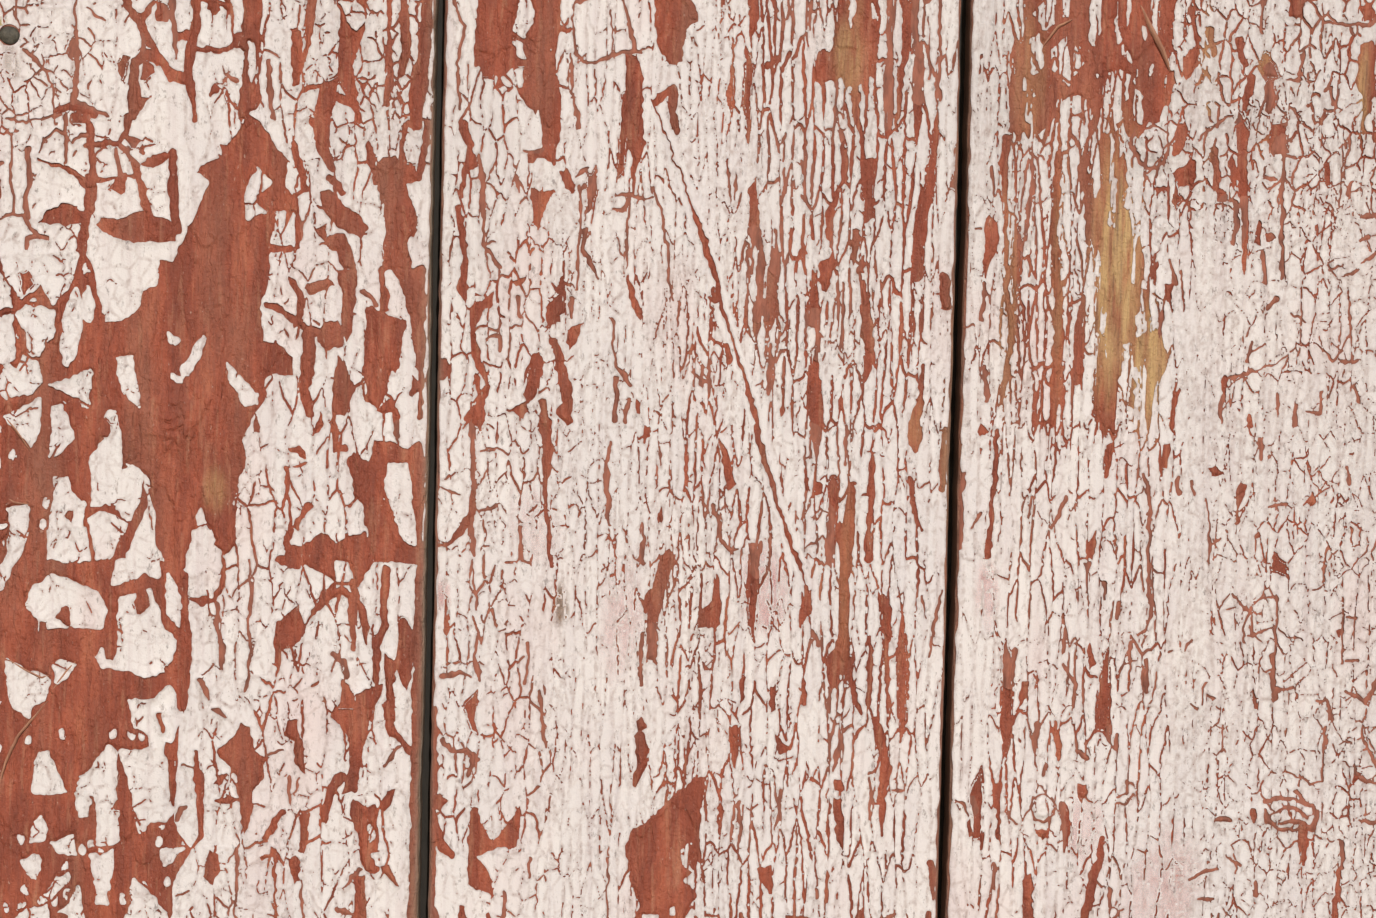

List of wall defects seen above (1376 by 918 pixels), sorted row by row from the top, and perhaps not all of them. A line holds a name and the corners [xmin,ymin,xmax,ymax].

peeling [0,0,584,918]
crack [446,0,544,360]
crack [434,419,557,756]
crack [561,0,684,573]
peeling [615,0,949,918]
crack [724,81,855,407]
crack [802,622,912,829]
crack [878,0,951,132]
peeling [930,265,953,319]
crack [968,143,1045,253]
peeling [974,0,1271,563]
crack [1125,0,1376,462]